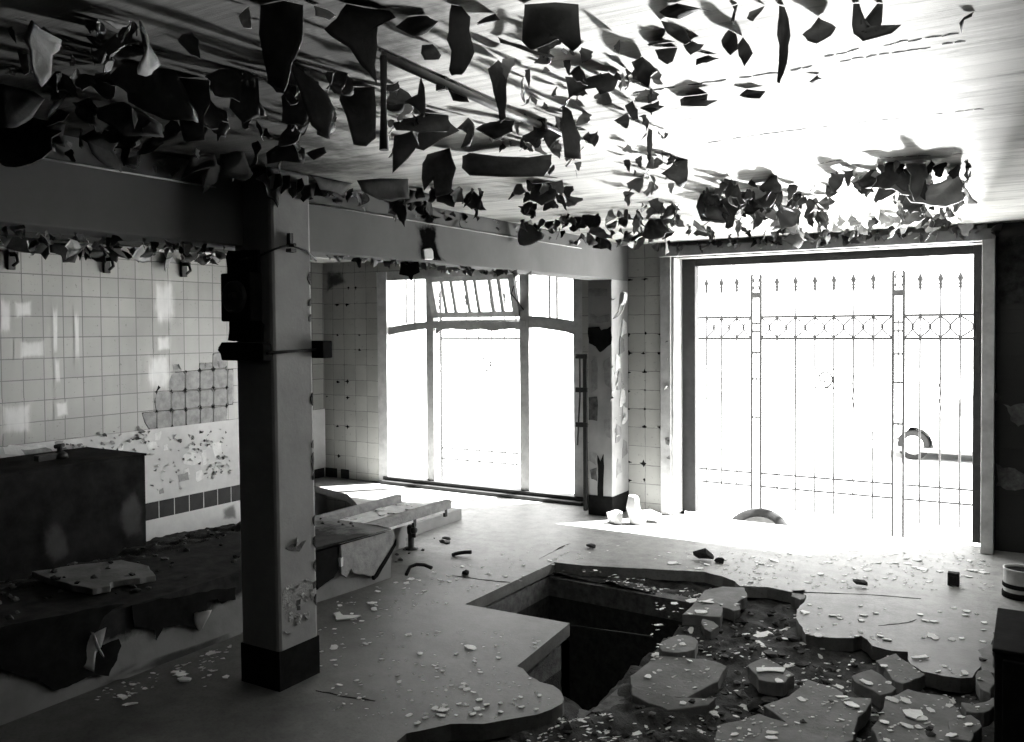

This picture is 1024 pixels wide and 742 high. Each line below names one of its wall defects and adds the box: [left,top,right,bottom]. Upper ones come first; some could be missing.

peeling [0,1,1024,304]
peeling [3,347,233,494]
flaking render [588,313,628,481]
spalling [282,515,397,635]
spalling [483,573,695,718]